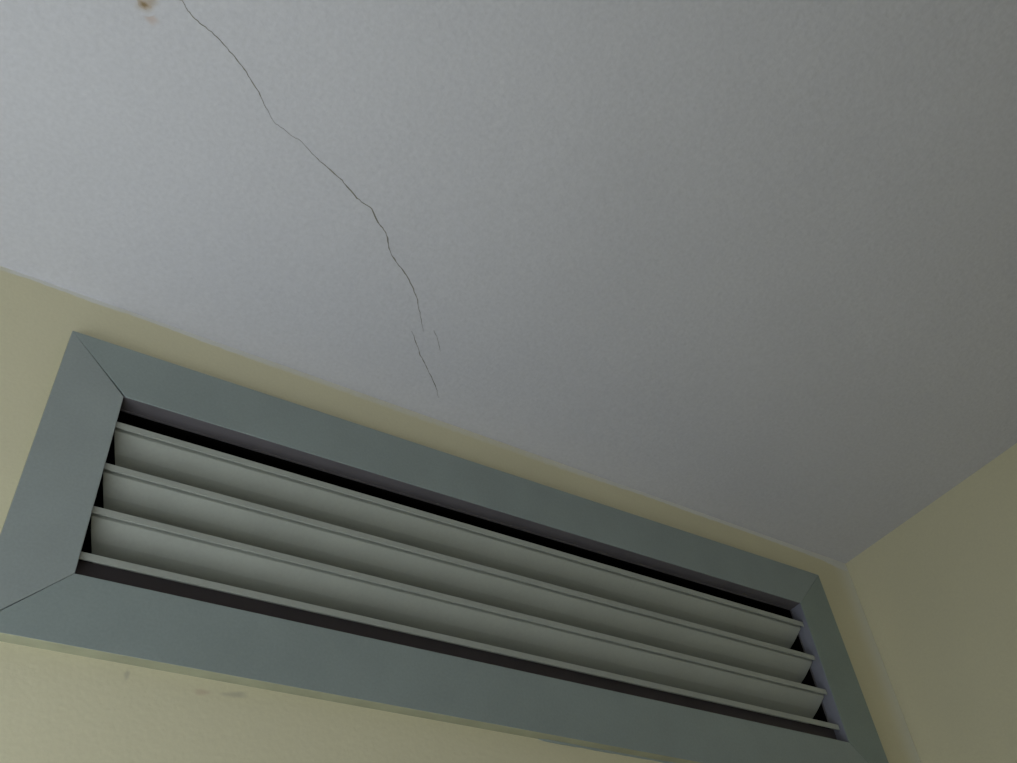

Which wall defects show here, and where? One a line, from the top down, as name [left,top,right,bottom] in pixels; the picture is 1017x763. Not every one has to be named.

crack [181,0,440,395]